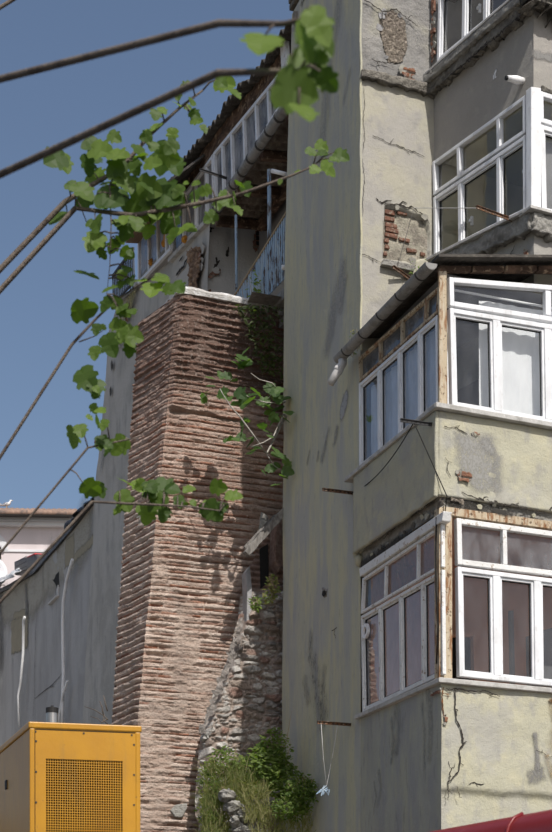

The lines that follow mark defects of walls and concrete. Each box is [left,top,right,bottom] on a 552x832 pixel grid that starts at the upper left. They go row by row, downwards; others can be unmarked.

spalling [376,8,416,80]
crack [362,92,429,222]
spalling [186,242,221,288]
spalling [380,205,428,274]
spalling [455,469,472,482]
crack [441,687,500,798]